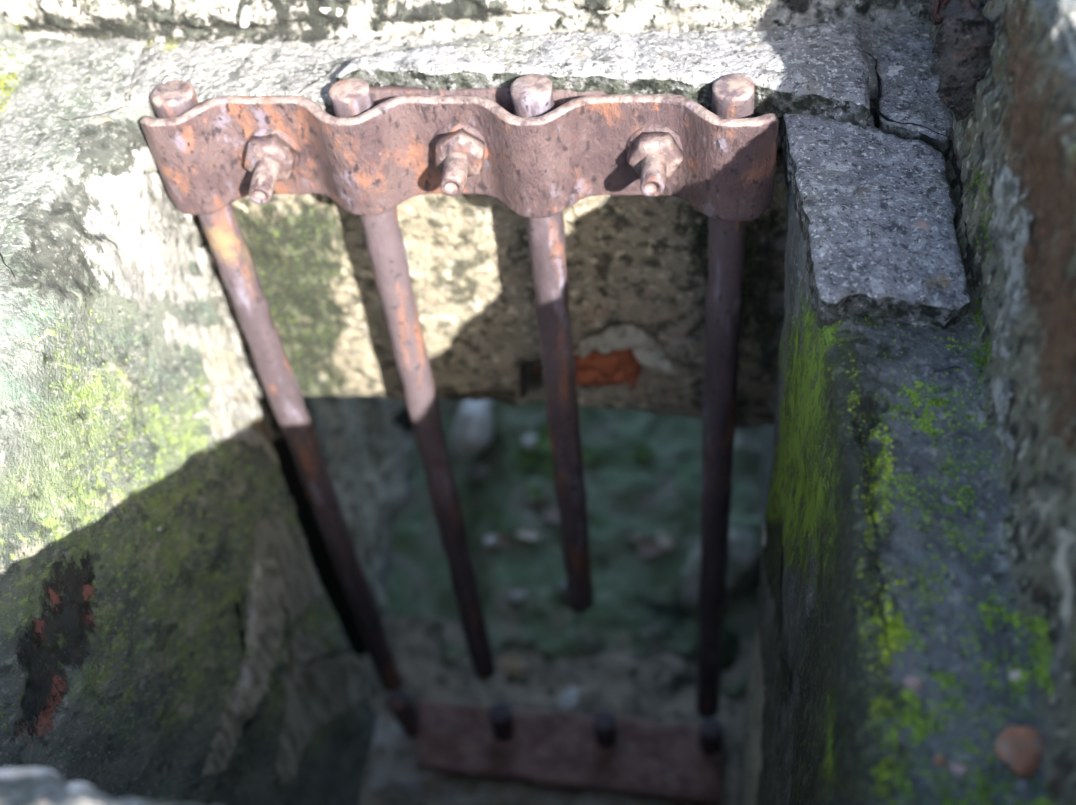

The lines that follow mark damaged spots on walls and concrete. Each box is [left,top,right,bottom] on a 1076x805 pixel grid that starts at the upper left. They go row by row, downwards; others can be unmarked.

crack [863,50,976,293]
spalling [13,551,98,746]
leakage [762,516,782,632]
leakage [777,314,907,805]
crack [863,442,898,673]